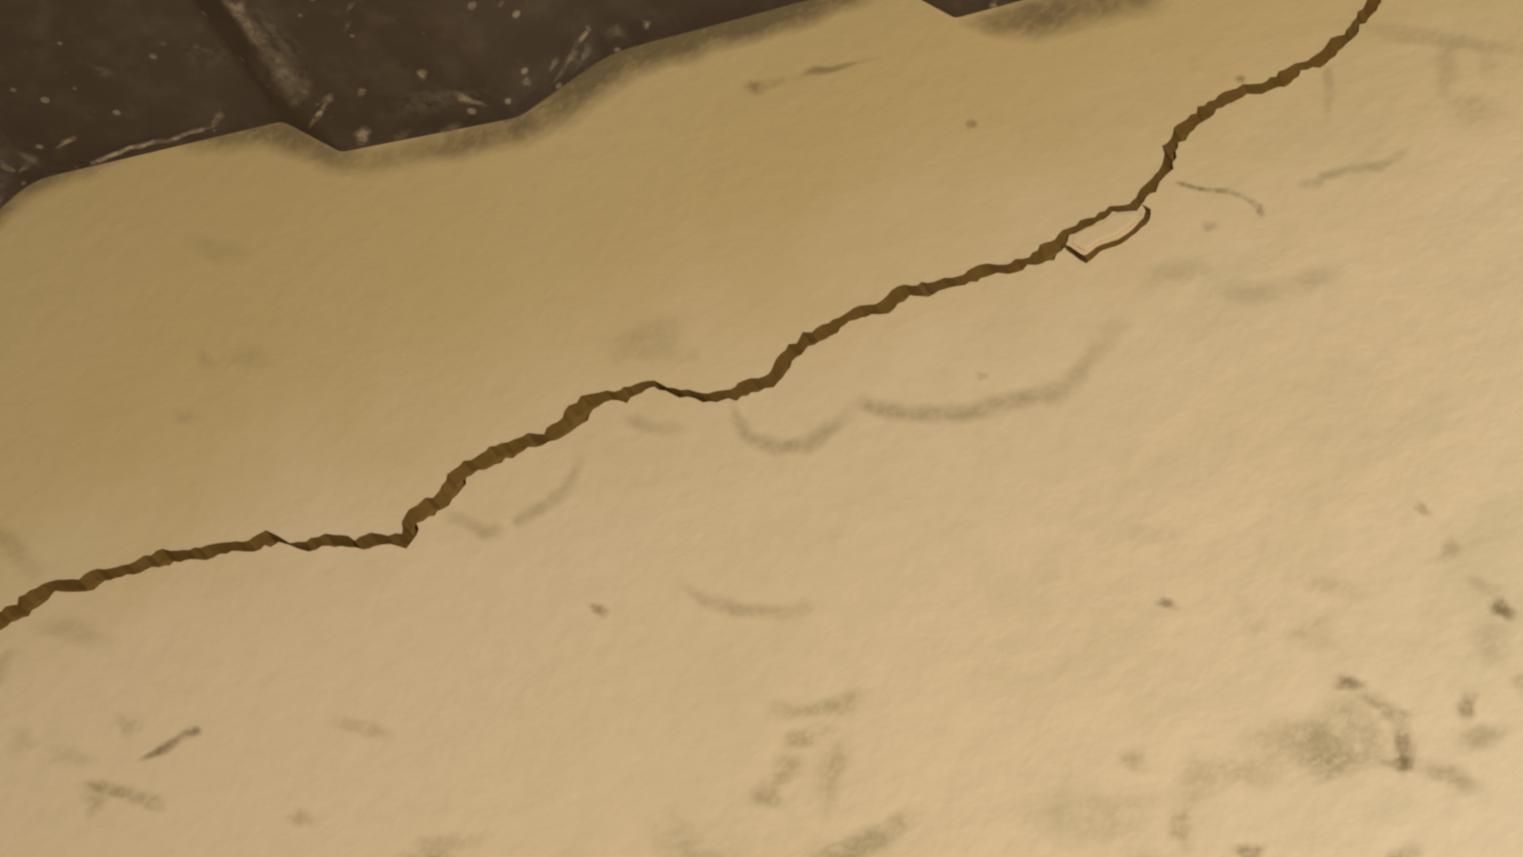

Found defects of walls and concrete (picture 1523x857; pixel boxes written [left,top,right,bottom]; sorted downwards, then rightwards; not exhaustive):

crack [0,0,1381,630]